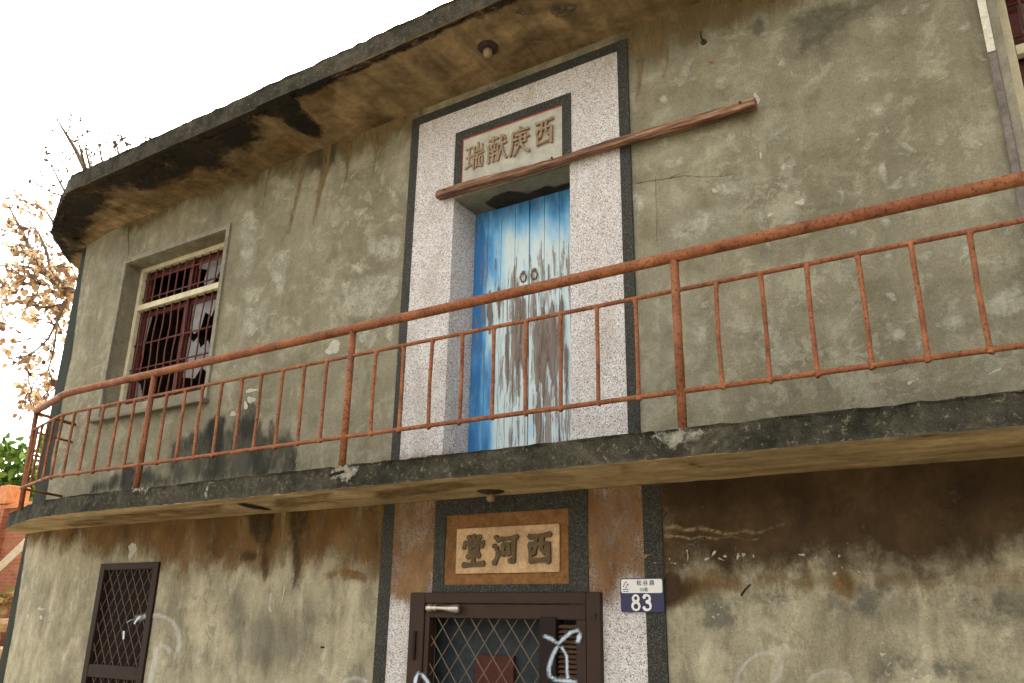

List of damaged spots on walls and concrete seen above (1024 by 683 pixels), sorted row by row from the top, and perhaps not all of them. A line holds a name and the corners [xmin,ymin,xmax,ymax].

water stain [32,0,516,504]
water stain [0,483,470,683]
spalling [329,464,358,481]
spalling [653,428,703,450]
water stain [580,456,1024,627]